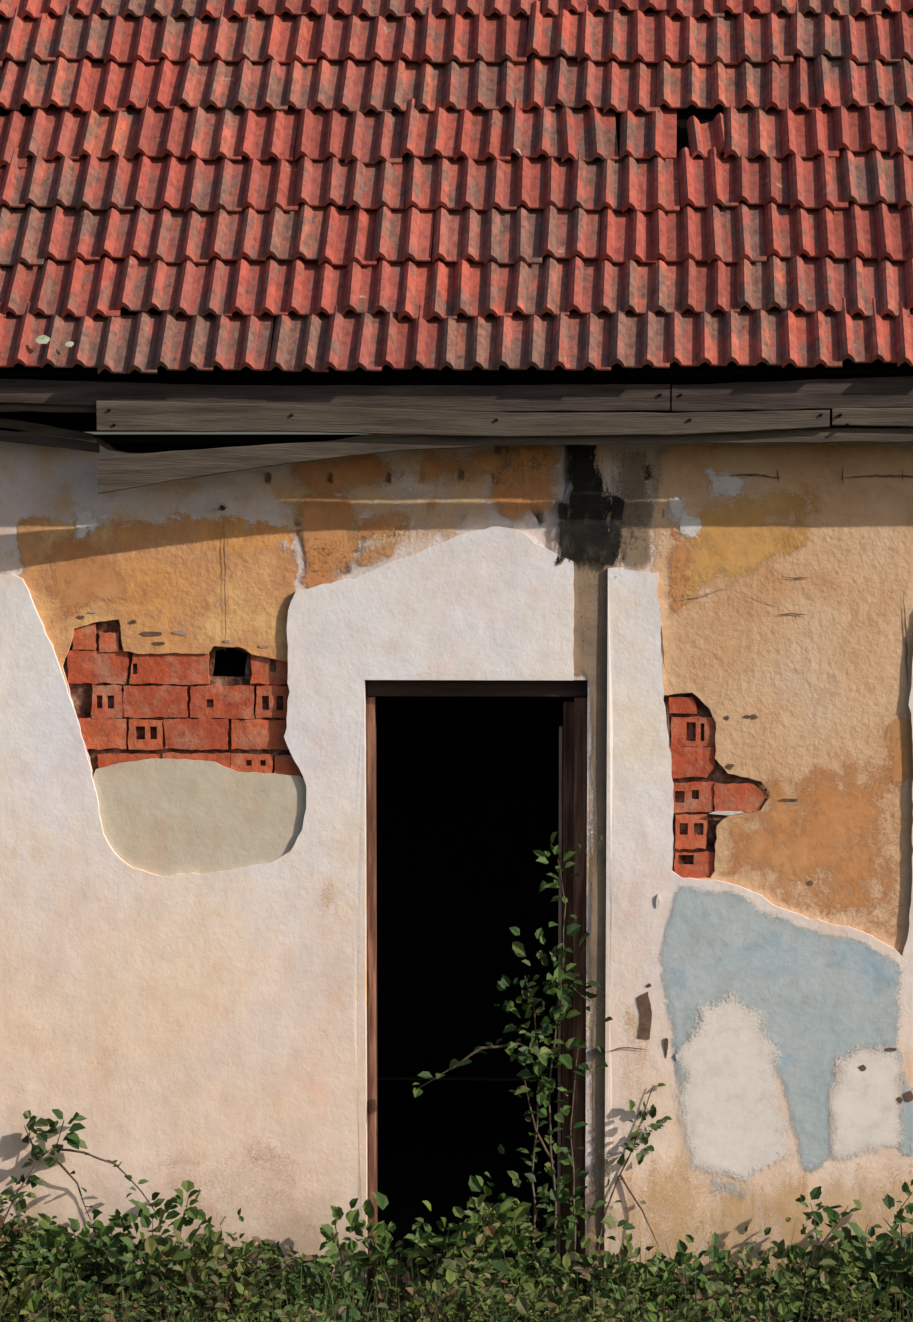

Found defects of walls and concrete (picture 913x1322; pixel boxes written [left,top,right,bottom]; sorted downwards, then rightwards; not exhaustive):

spalling [686,113,734,160]
water stain [28,467,130,620]
flaking render [15,445,564,876]
water stain [131,443,913,1278]
flaking render [637,443,913,1199]